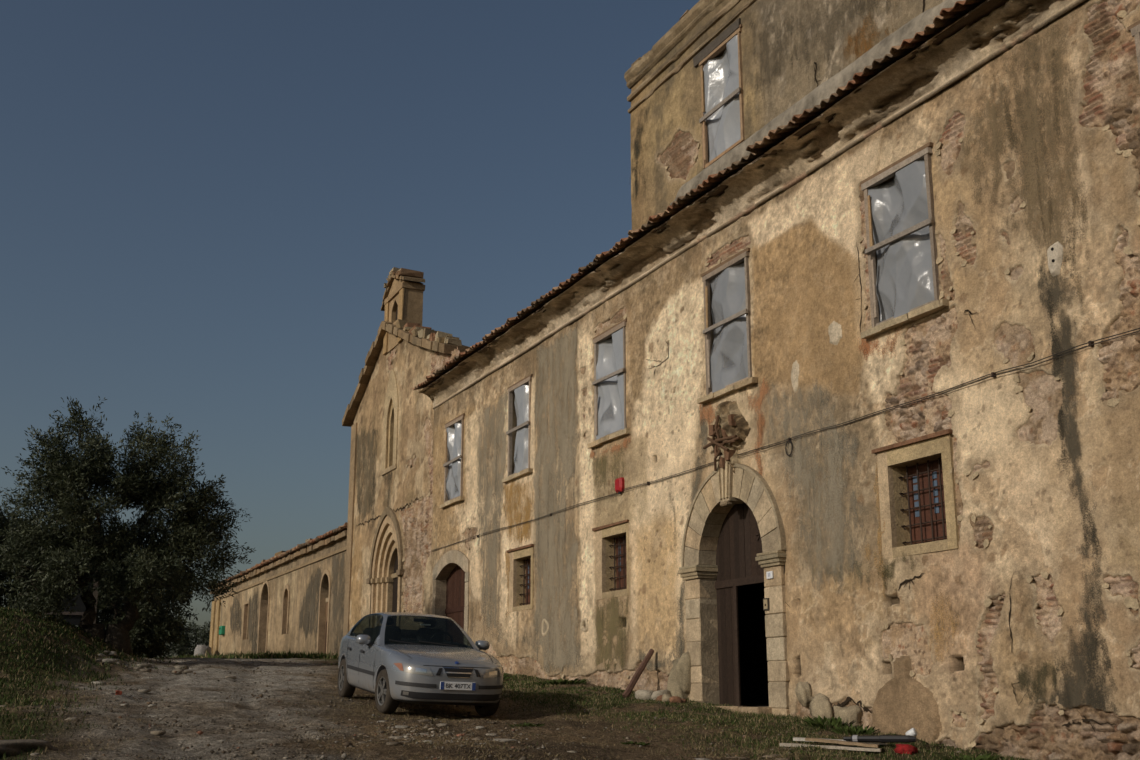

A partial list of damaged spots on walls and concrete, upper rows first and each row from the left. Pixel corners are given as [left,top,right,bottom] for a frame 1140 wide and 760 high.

flaking render [657,130,700,180]
flaking render [934,112,966,176]
flaking render [1079,0,1140,197]
flaking render [885,202,994,549]
damp [963,28,1098,559]
flaking render [1096,226,1140,407]
flaking render [941,594,1140,760]
flaking render [1027,571,1064,643]
damp [1030,568,1117,713]
flaking render [1102,575,1140,616]